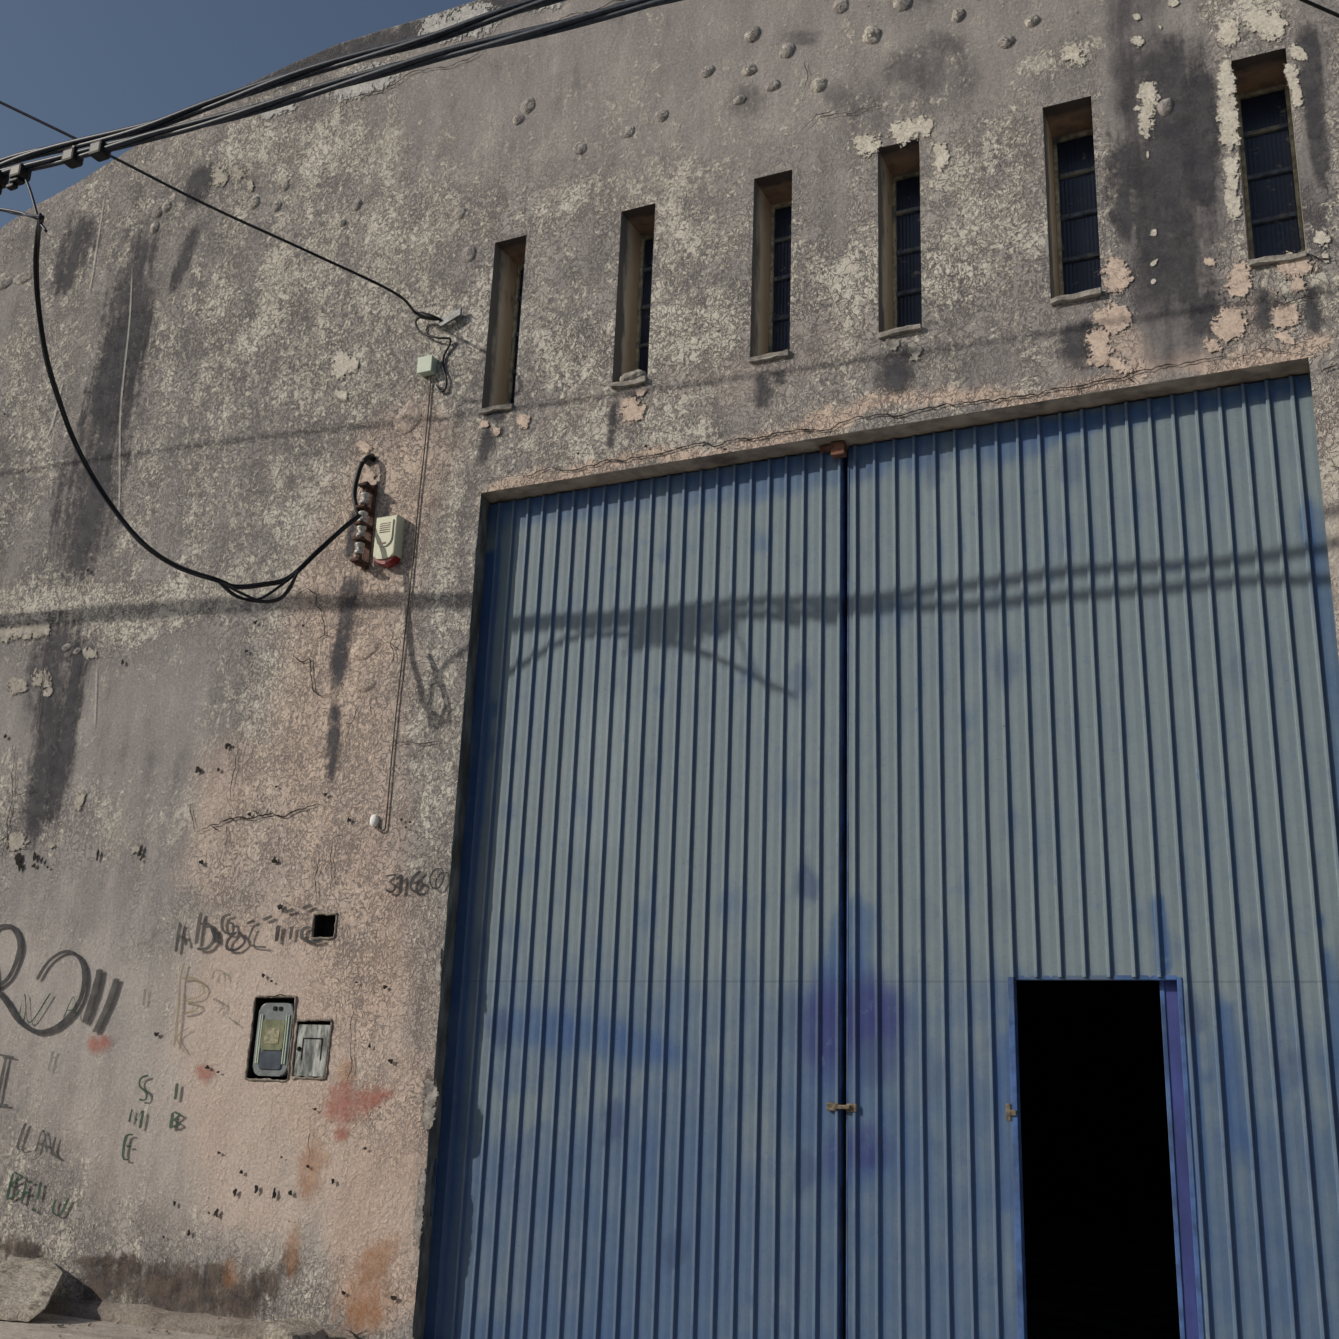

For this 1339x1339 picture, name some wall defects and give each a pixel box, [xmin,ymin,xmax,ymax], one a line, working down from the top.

crack [274,52,479,128]
crack [805,105,888,127]
peeling [1133,79,1161,158]
leakage [1108,35,1220,335]
peeling [1213,0,1308,220]
peeling [1084,254,1137,377]
peeling [1201,257,1252,353]
crack [1278,254,1336,310]
leakage [52,230,157,586]
crack [480,343,1337,484]
leakage [23,613,97,840]
leakage [325,578,362,779]